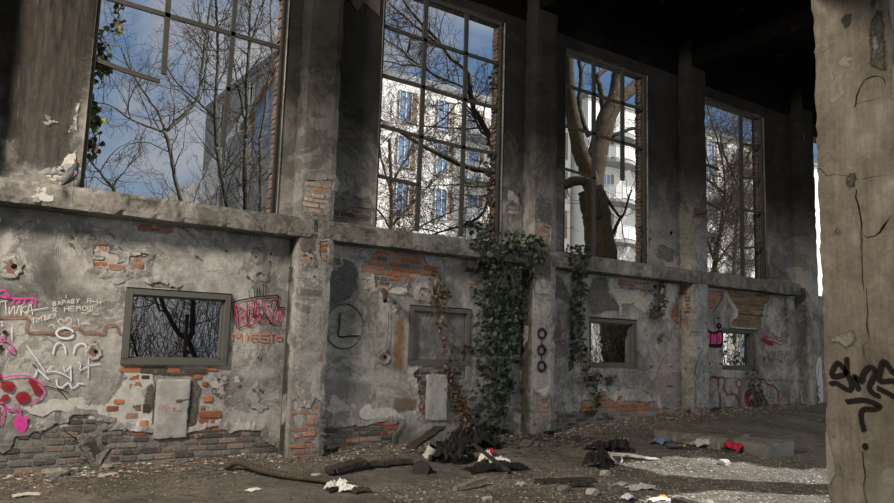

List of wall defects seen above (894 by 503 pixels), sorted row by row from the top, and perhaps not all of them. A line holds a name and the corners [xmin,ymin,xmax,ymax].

spalling [869,0,886,71]
peeling [535,197,555,251]
flaking render [288,234,444,313]
peeling [535,262,691,335]
flaking render [707,287,795,334]
crack [818,168,892,360]
flaking render [0,365,491,475]